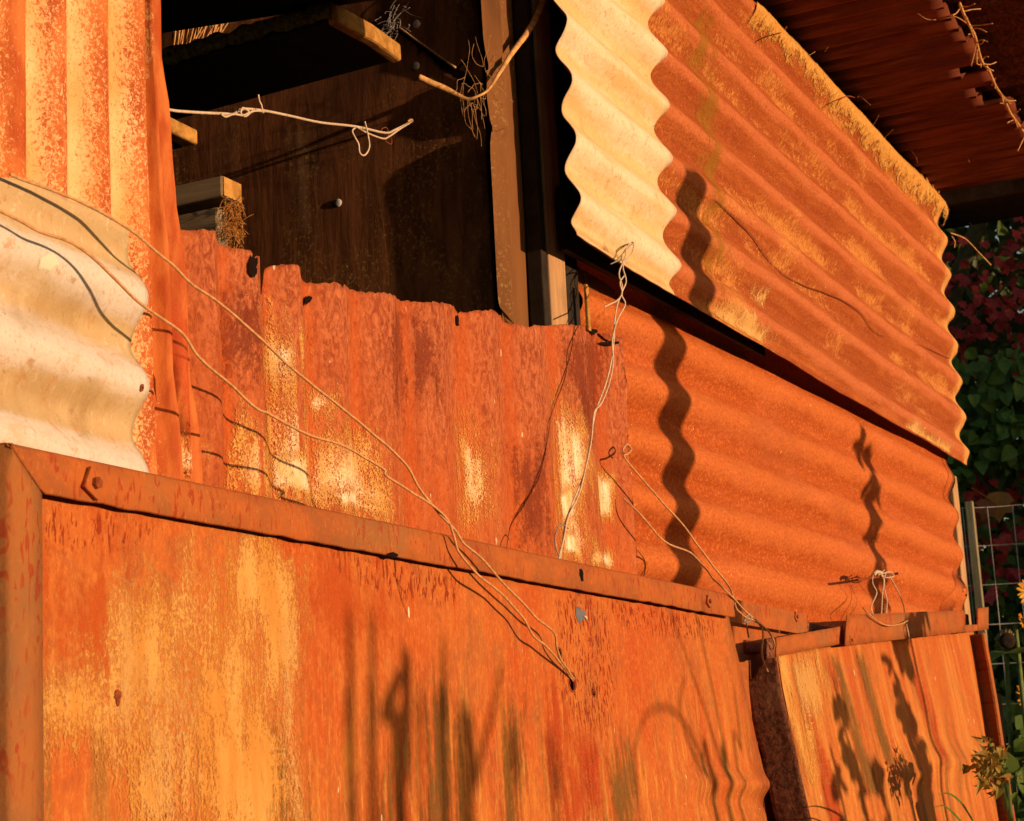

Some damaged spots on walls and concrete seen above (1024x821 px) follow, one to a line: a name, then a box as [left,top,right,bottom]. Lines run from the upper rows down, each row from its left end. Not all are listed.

corrosion [172,312,191,433]
corrosion [221,284,262,386]
corrosion [392,305,443,406]
corrosion [564,334,609,442]
corrosion [511,438,551,550]
corrosion [802,697,843,821]